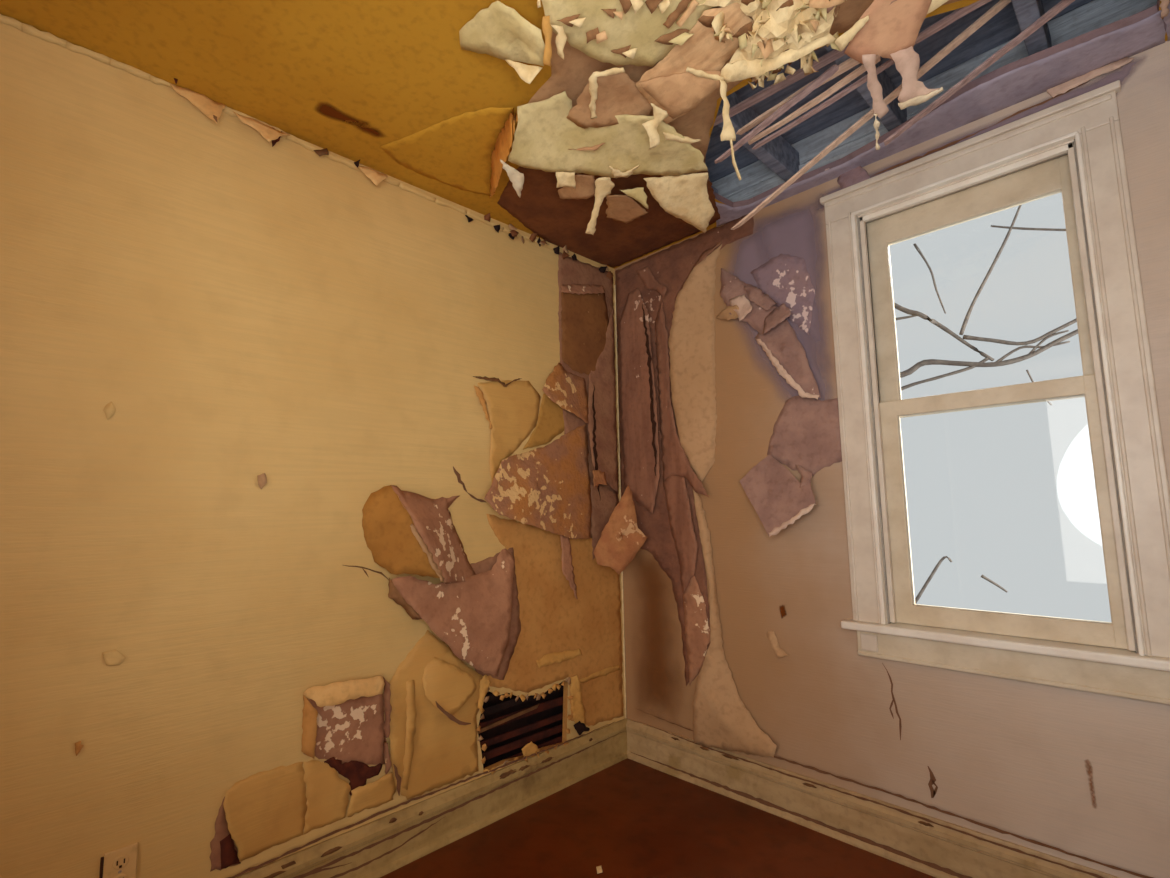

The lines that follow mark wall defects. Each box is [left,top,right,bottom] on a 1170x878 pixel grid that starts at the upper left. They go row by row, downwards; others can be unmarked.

peeling [459,0,1170,208]
peeling [751,254,815,335]
peeling [228,67,771,878]
peeling [767,396,842,476]
crack [882,663,902,740]
crack [631,752,972,878]